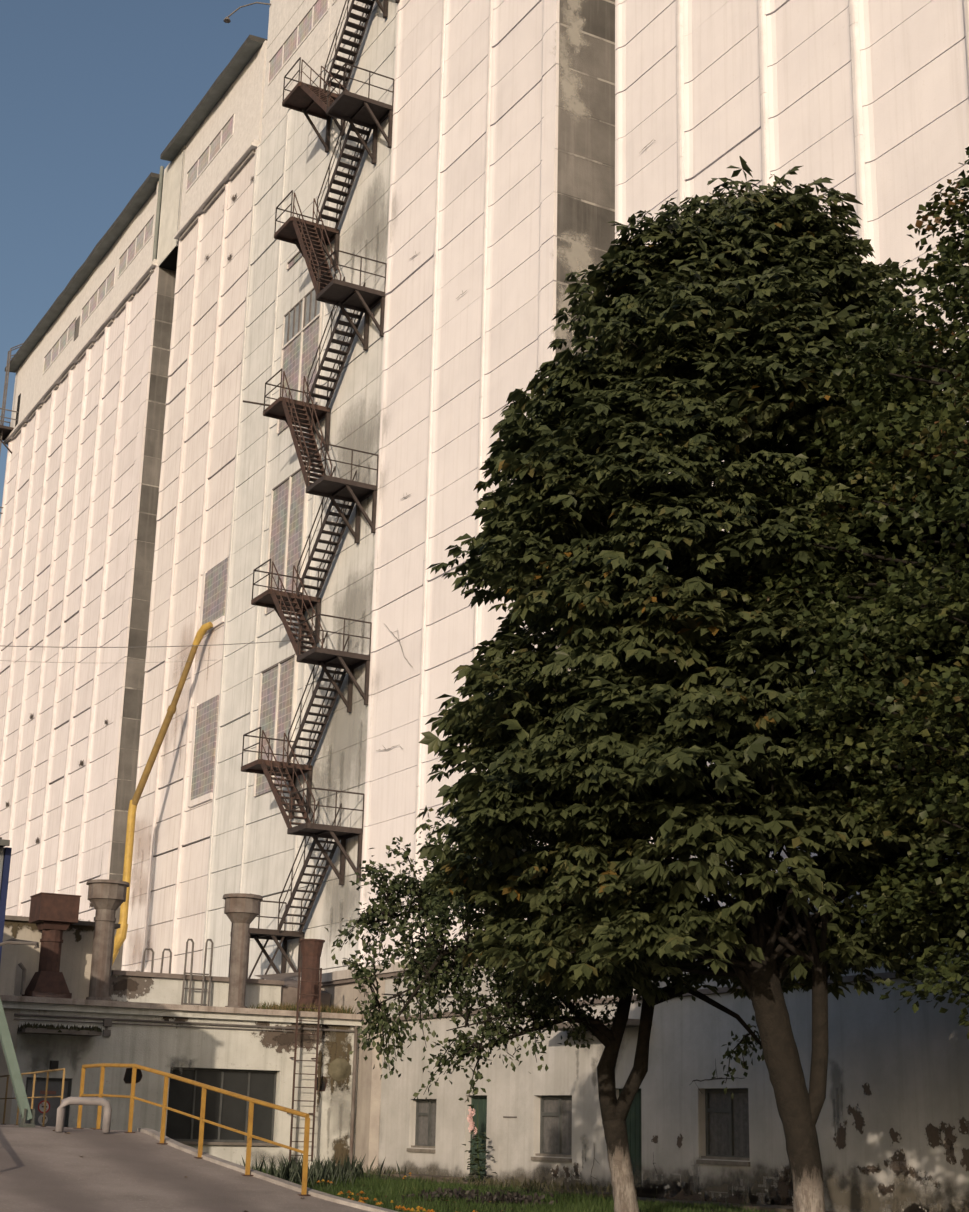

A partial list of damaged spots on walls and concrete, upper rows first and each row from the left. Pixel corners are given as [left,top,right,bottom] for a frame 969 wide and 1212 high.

water stain [559,0,585,116]
peeling [252,1021,330,1053]
peeling [833,1083,871,1150]
peeling [925,1117,969,1171]